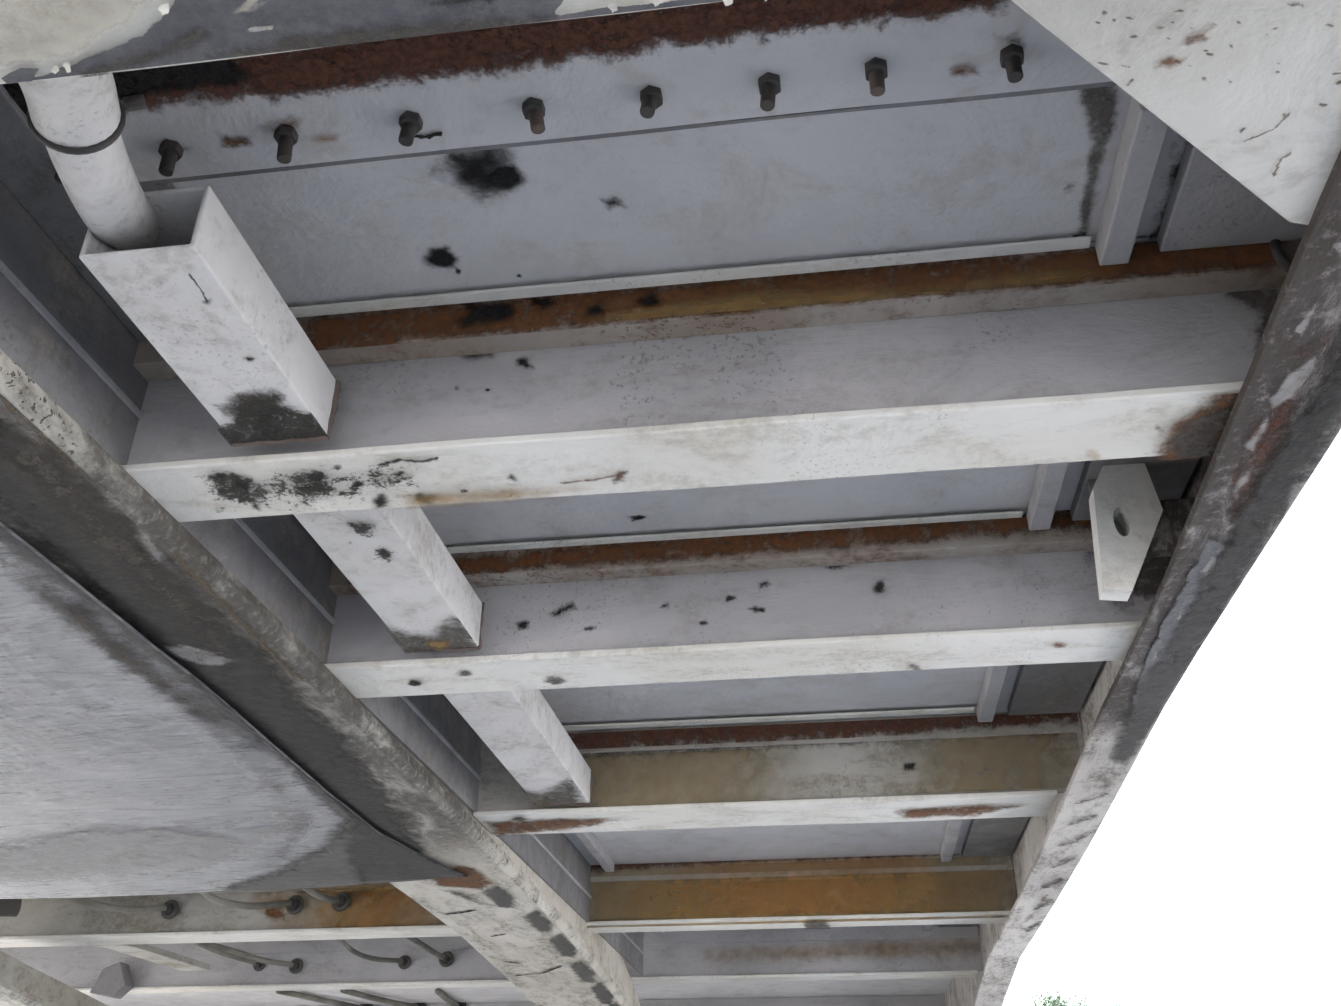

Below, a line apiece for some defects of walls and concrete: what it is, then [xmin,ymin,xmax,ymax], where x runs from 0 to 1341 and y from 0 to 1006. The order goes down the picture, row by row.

peeling [1,0,733,83]
corrosion [112,0,1001,114]
corrosion [2,82,28,115]
corrosion [305,241,1277,351]
water stain [378,457,439,466]
corrosion [1156,393,1239,461]
corrosion [454,510,1091,575]
corrosion [490,713,1078,835]
corrosion [587,854,1018,928]